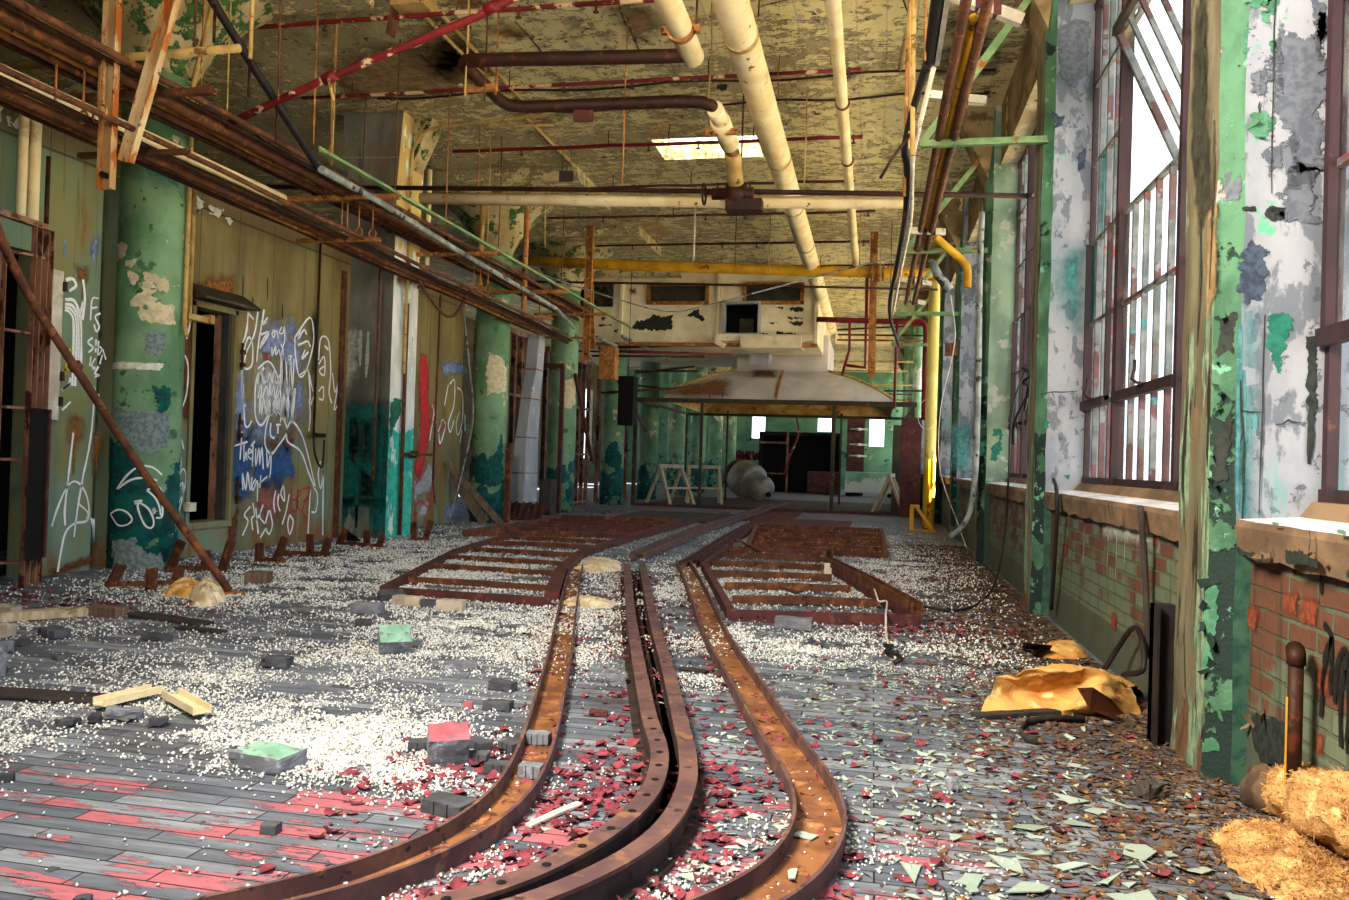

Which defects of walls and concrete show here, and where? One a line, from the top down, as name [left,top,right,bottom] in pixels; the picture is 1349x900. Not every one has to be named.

peeling [196,0,803,265]
peeling [750,0,934,307]
spalling [1206,0,1328,363]
rust [76,267,88,300]
rust [202,278,234,293]
peeling [108,242,176,496]
peeling [485,352,507,396]
peeling [1265,312,1293,374]
peeling [473,434,504,487]
spalling [1207,383,1234,490]
spalling [1237,547,1327,569]
spalling [1240,709,1285,769]